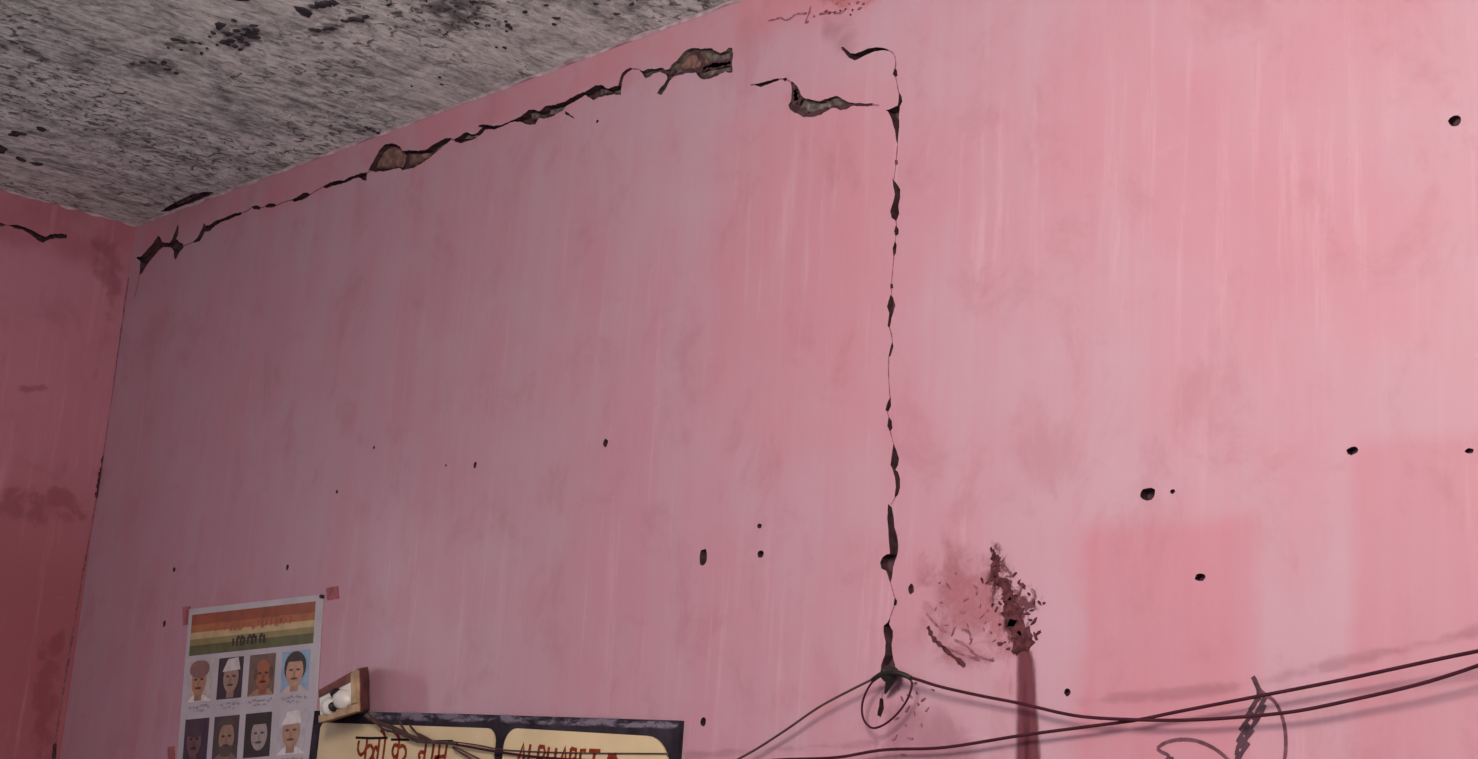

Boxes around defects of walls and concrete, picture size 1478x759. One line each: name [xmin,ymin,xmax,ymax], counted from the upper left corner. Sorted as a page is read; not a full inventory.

spalling [640,48,733,95]
spalling [750,78,879,117]
crack [0,223,67,243]
crack [52,68,639,759]
crack [841,47,994,717]
damp [942,571,1004,635]